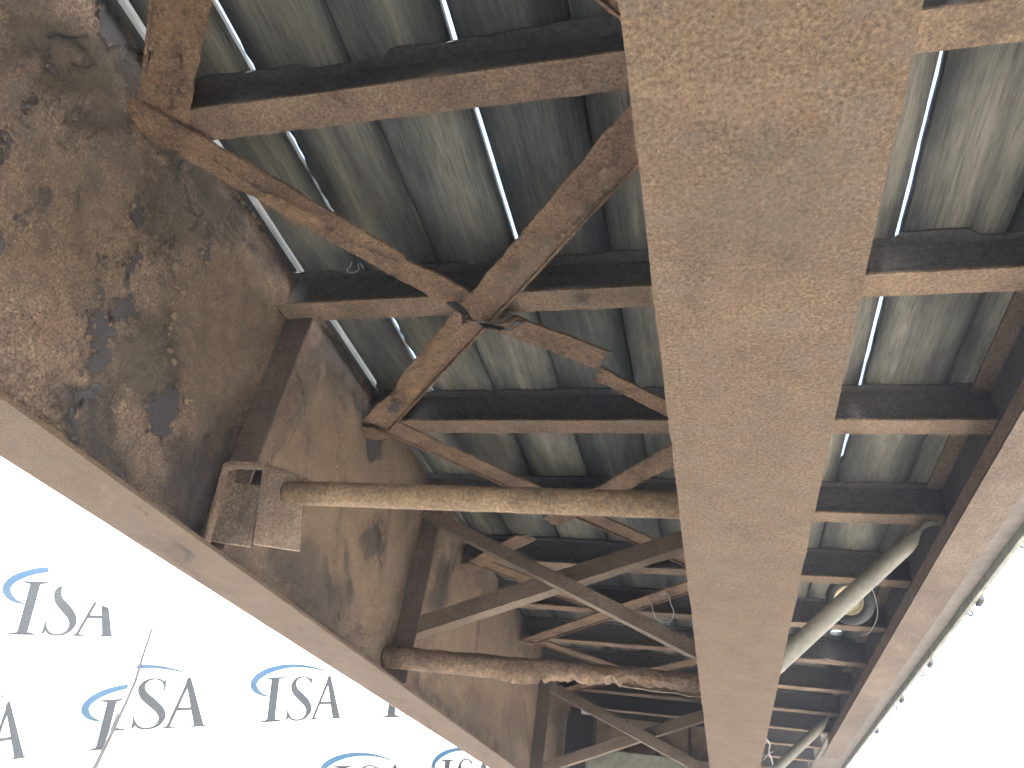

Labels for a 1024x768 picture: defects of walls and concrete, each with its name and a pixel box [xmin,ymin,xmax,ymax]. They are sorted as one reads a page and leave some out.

spalling [76,185,156,380]
spalling [141,381,193,446]